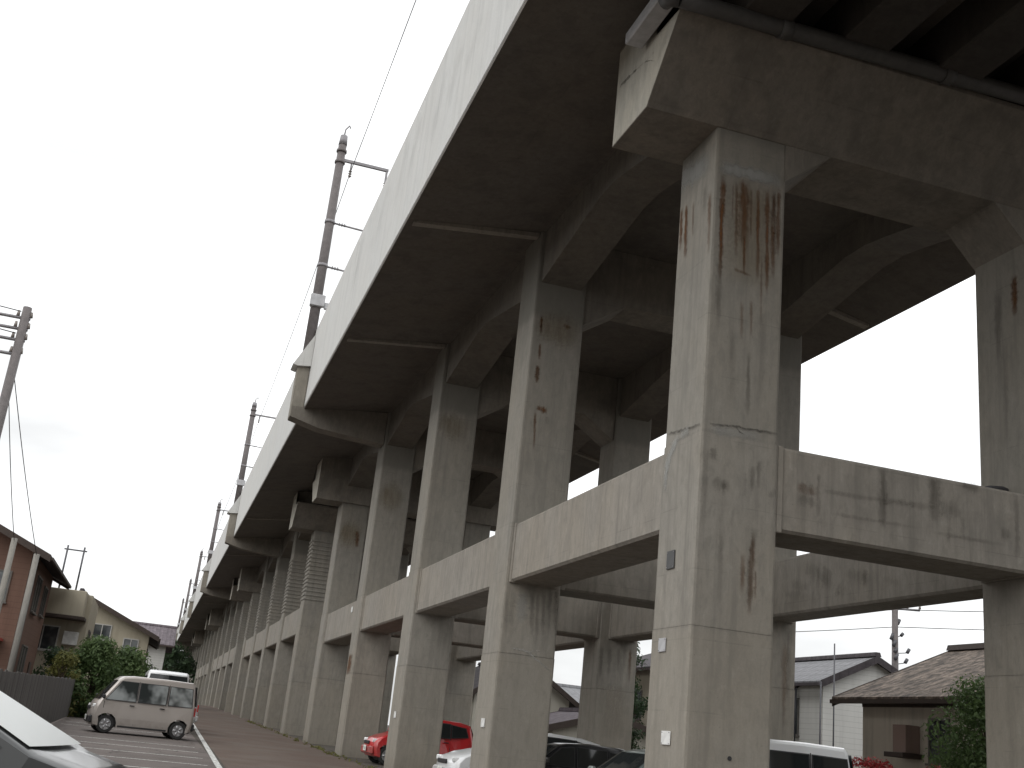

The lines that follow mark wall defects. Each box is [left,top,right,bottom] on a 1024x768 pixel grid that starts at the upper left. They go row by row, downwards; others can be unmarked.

rust [741,184,780,279]